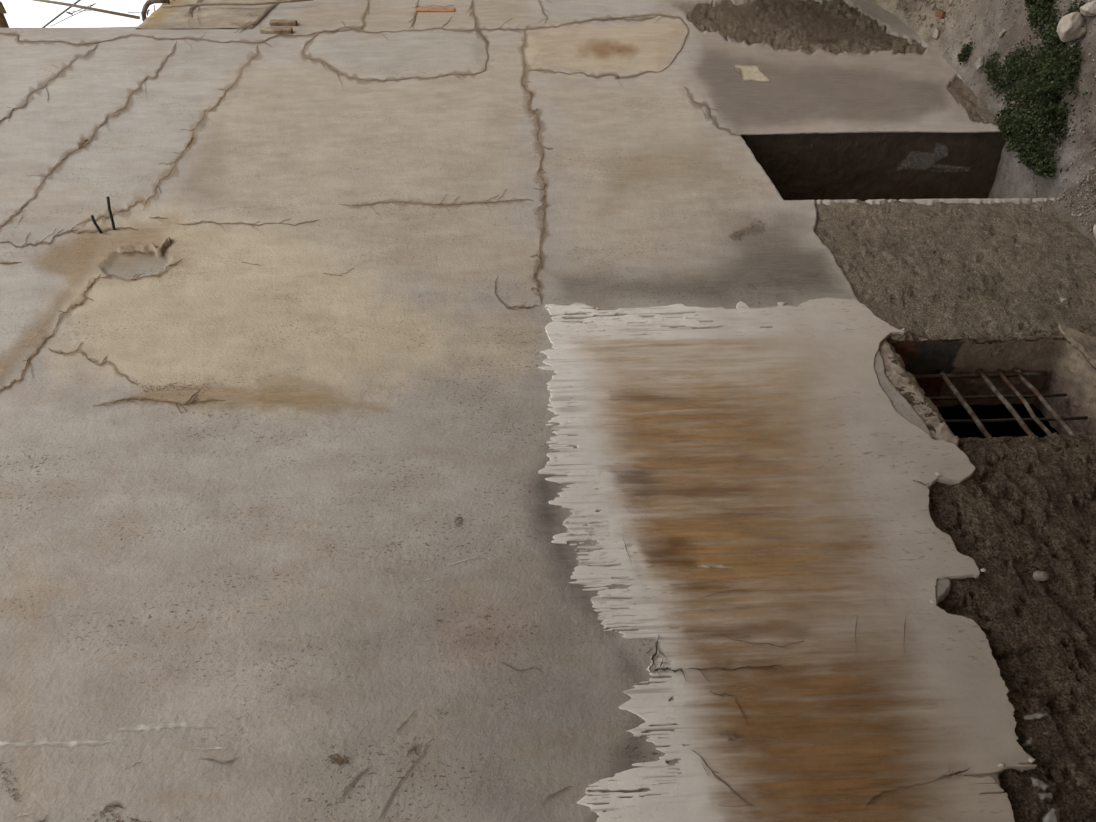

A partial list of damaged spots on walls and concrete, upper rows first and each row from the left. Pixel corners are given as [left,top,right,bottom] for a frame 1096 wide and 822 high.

spalling [672,0,927,55]
crack [0,0,733,310]
spalling [112,236,170,257]
crack [0,258,225,414]
peeling [538,200,1096,822]